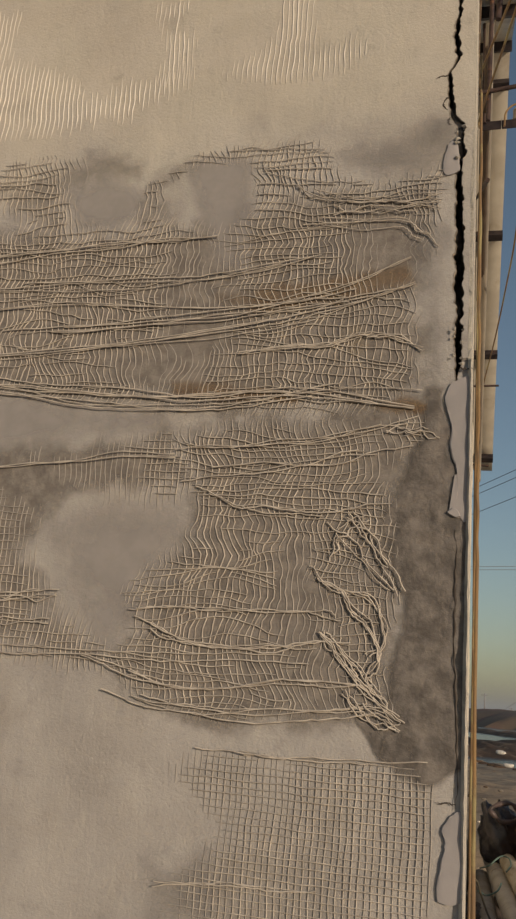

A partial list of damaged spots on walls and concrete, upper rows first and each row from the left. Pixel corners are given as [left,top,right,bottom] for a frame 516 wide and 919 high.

flaking render [443,139,460,176]
crack [438,0,473,381]
spalling [355,376,469,786]